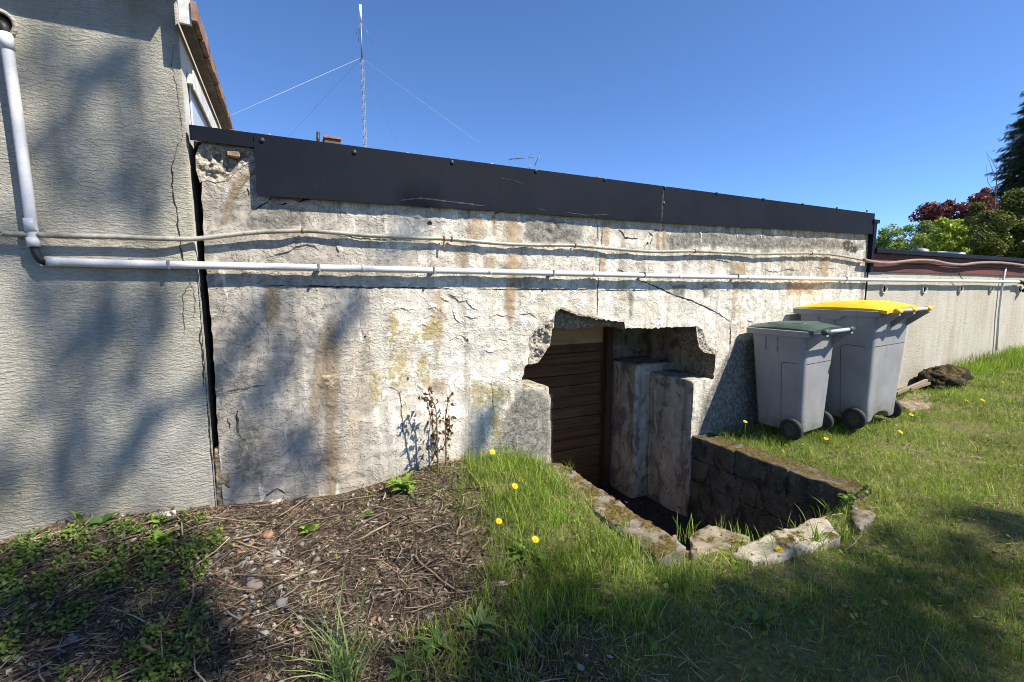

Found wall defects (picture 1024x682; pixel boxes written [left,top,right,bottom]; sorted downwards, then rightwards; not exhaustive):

spalling [196,142,255,183]
crack [171,51,267,464]
leakage [264,287,279,325]
crack [478,223,751,345]
spalling [528,307,603,364]
spalling [696,326,718,355]
leakage [310,321,339,493]